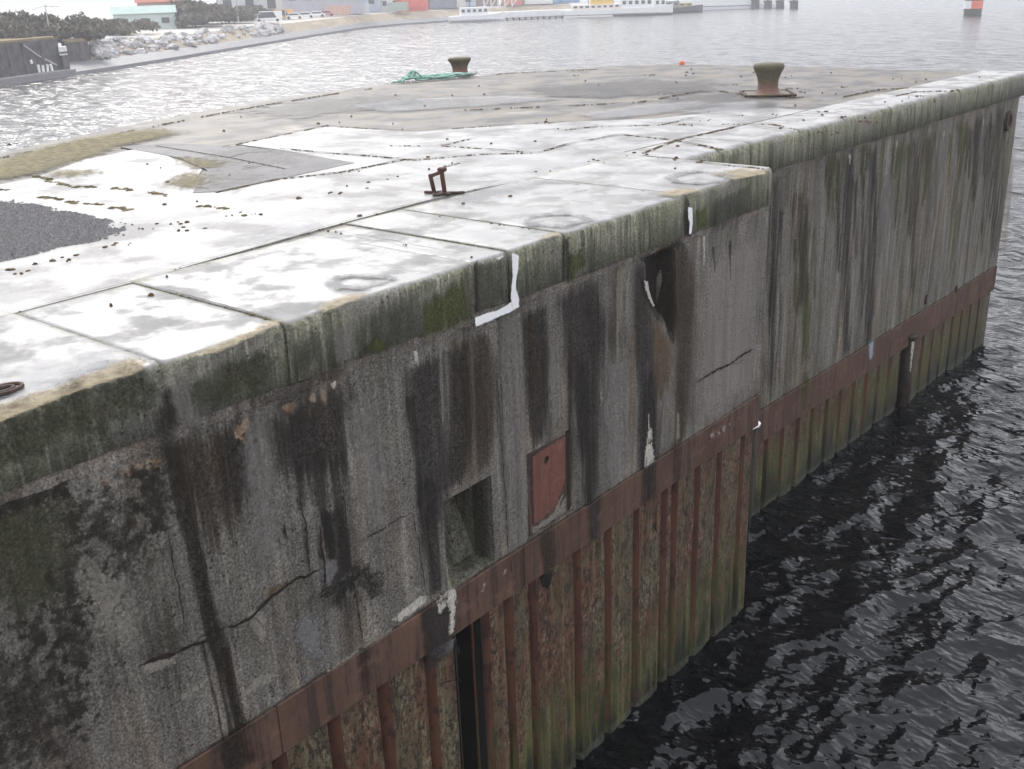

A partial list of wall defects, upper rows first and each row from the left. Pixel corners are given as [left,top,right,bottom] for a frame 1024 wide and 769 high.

damp [53,382,255,769]
corrosion [234,419,248,440]
crack [137,489,437,676]
damp [220,389,392,598]
corrosion [283,381,336,417]
damp [405,343,472,671]
corrosion [473,333,498,470]
spalling [642,240,682,342]
corrosion [677,246,694,441]
crack [697,349,752,382]
damp [837,149,894,360]
damp [0,624,101,769]